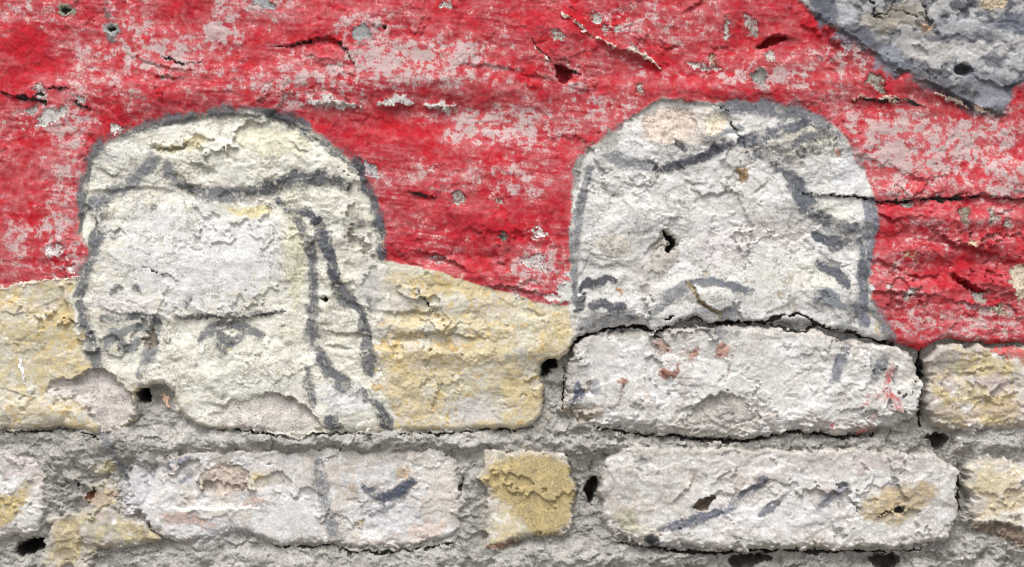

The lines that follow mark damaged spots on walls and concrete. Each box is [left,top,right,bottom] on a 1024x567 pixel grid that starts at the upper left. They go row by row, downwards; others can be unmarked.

crack [276,37,350,57]
peeling [561,10,661,69]
crack [1,87,91,111]
peeling [25,82,86,127]
peeling [377,94,456,112]
spalling [642,106,728,144]
spalling [152,143,186,153]
crack [802,192,1024,204]
peeling [44,243,65,257]
spalling [1008,263,1024,302]
spalling [46,368,138,433]
spalling [207,392,320,438]